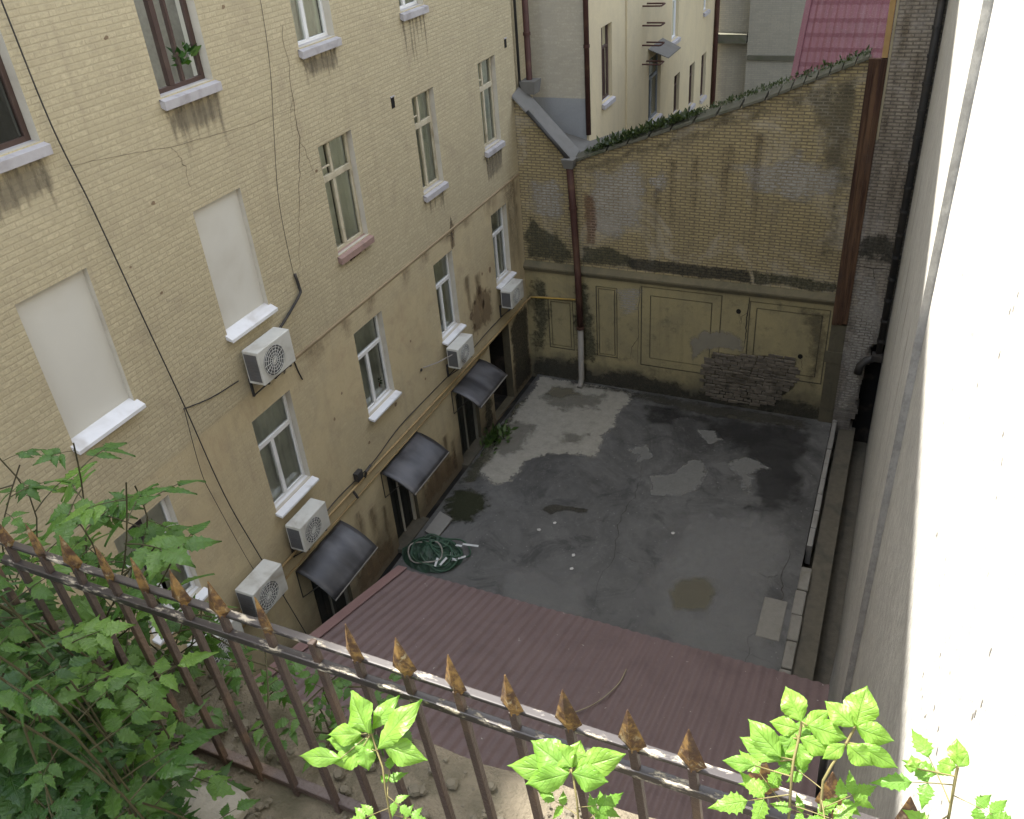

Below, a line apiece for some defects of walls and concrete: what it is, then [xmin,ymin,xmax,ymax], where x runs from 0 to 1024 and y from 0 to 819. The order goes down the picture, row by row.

crack [72,27,315,267]
damp [427,282,819,523]
flaking render [699,352,803,407]